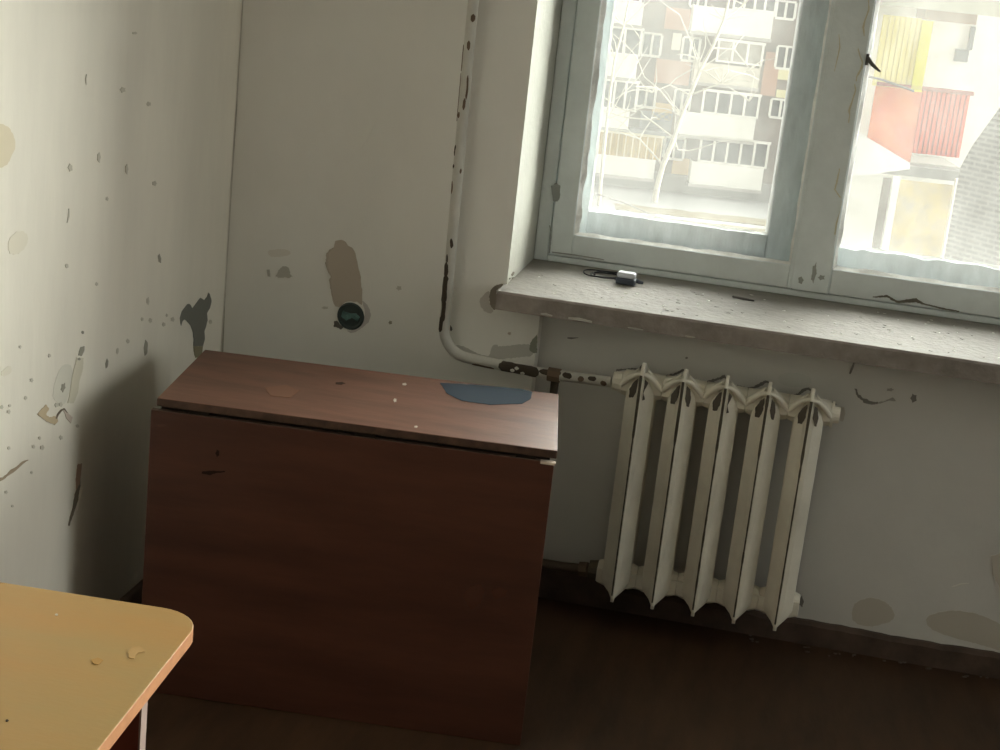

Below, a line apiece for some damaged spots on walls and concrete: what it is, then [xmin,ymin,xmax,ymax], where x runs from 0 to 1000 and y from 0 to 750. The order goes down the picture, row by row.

rust [457,41,470,118]
flaking render [171,293,212,346]
peeling [327,240,362,307]
rust [439,239,453,332]
crack [873,295,959,312]
peeling [38,405,73,425]
rust [472,361,548,377]
rust [560,372,607,386]
crack [855,389,896,405]
crack [0,460,28,481]
crack [68,481,81,526]
water stain [926,611,1000,650]